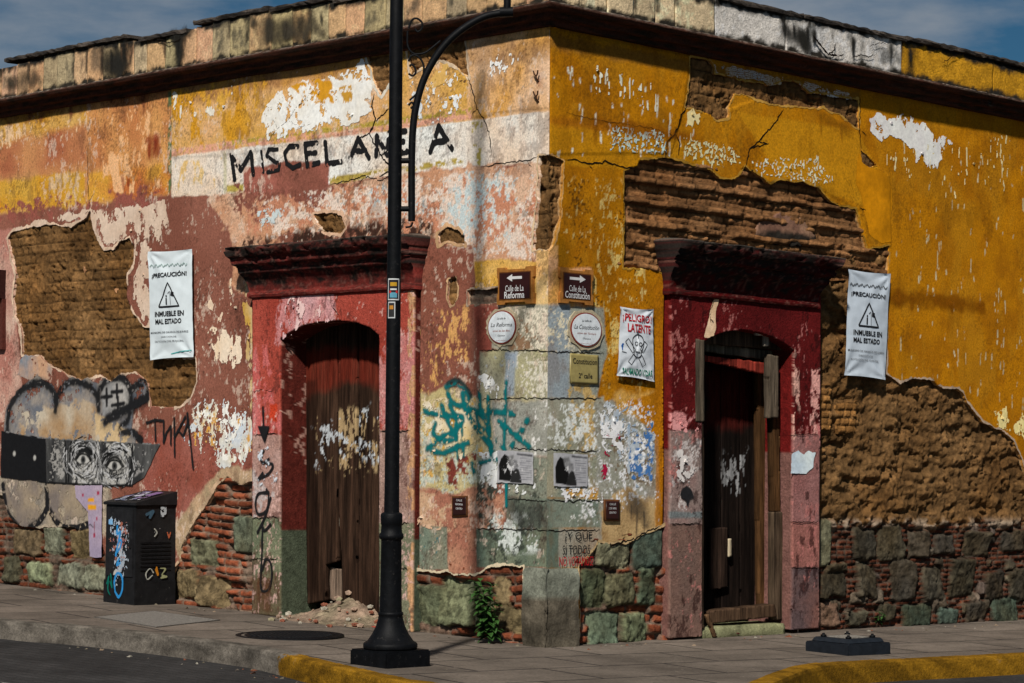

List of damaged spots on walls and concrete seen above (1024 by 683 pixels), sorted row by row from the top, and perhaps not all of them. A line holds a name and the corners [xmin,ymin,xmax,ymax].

peeling [261,54,389,141]
flaking render [312,209,347,237]
flaking render [435,222,467,248]
crack [468,79,538,167]
flaking render [531,153,565,252]
crack [568,159,637,171]
crack [745,109,784,167]
flaking render [610,55,1024,633]
flaking render [0,199,252,612]
flaking render [416,562,525,644]
flaking render [575,517,674,644]